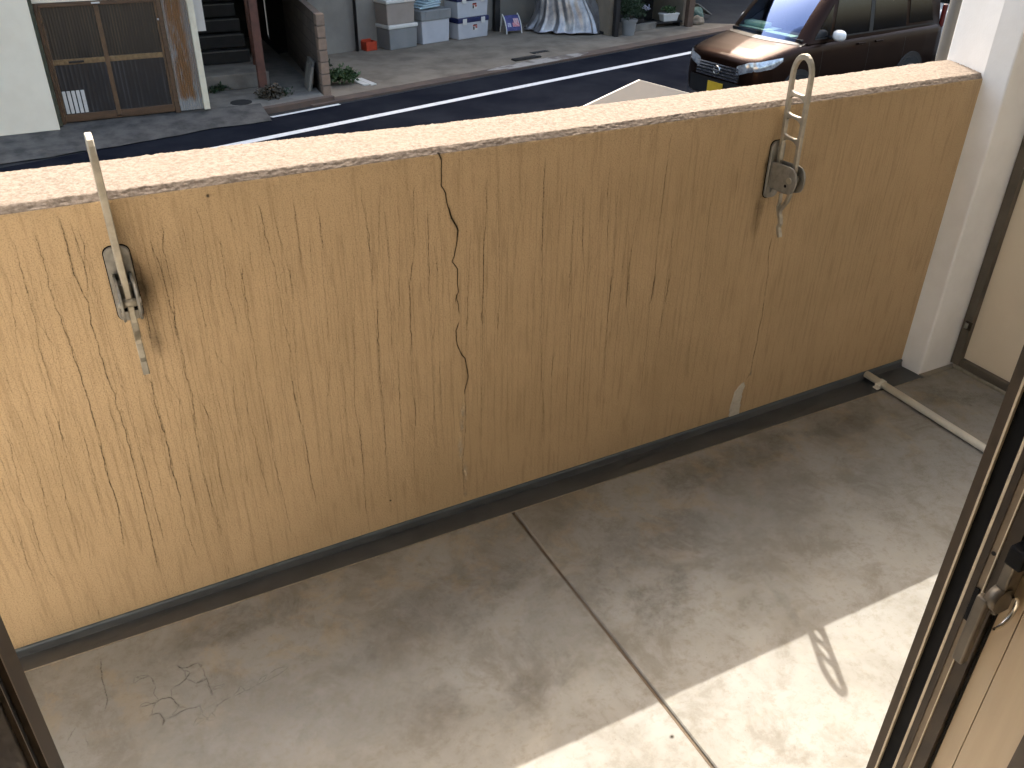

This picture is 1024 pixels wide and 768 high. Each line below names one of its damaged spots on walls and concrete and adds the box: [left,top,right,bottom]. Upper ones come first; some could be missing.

crack [438,154,468,486]